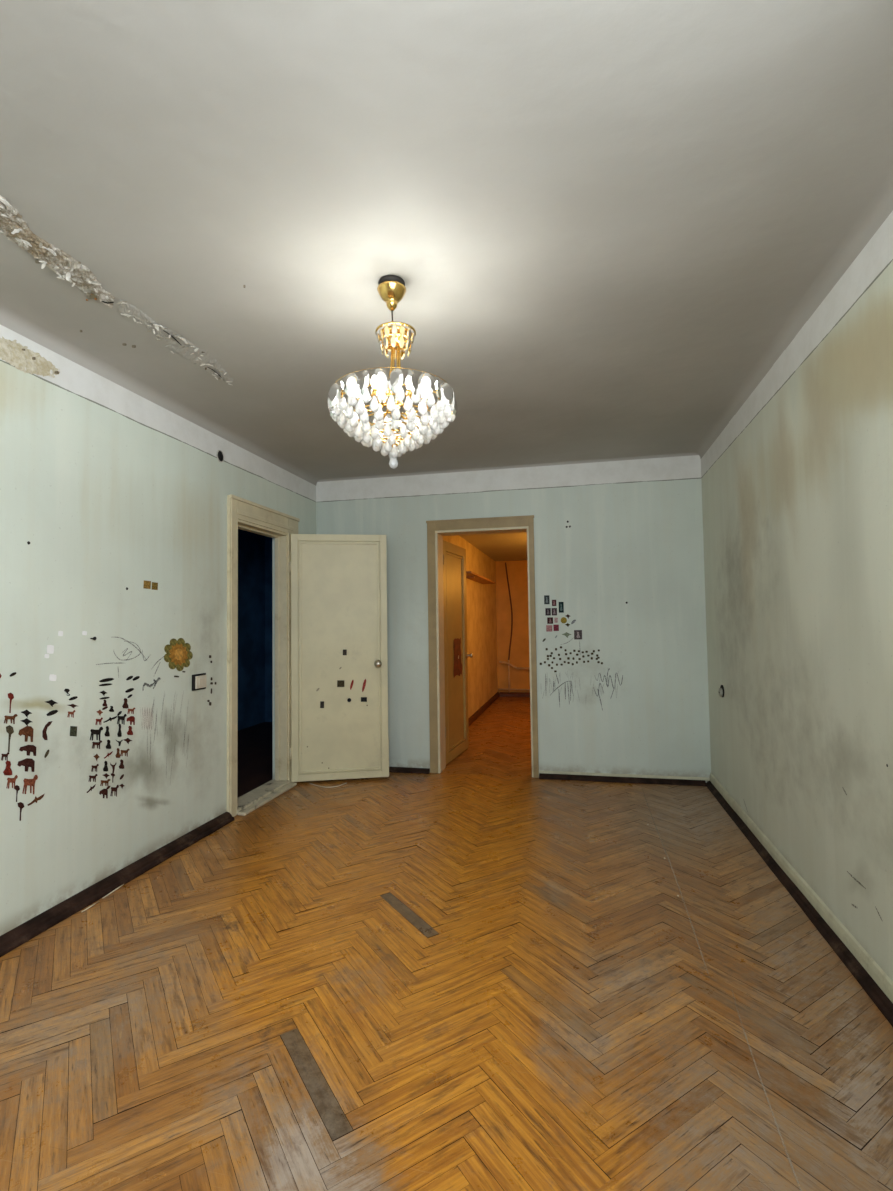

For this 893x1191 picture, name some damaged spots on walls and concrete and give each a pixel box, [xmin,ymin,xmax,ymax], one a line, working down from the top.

spalling [0,195,233,385]
water stain [728,277,893,675]